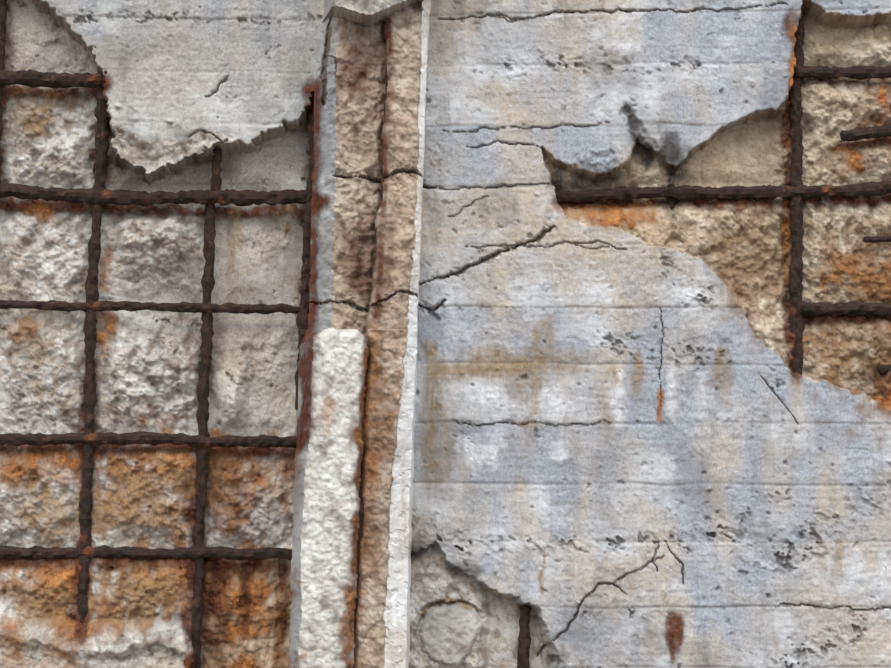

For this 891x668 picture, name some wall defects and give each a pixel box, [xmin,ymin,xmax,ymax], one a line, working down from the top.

crack [438,2,788,23]
spalling [0,0,323,668]
rust [0,75,330,644]
spalling [353,436,367,668]
rust [350,338,386,574]
crack [317,226,627,312]
crack [537,541,684,657]
spalling [409,474,891,668]
rust [552,198,790,229]
rust [666,613,684,660]
spalling [540,0,891,404]
crack [775,603,891,611]